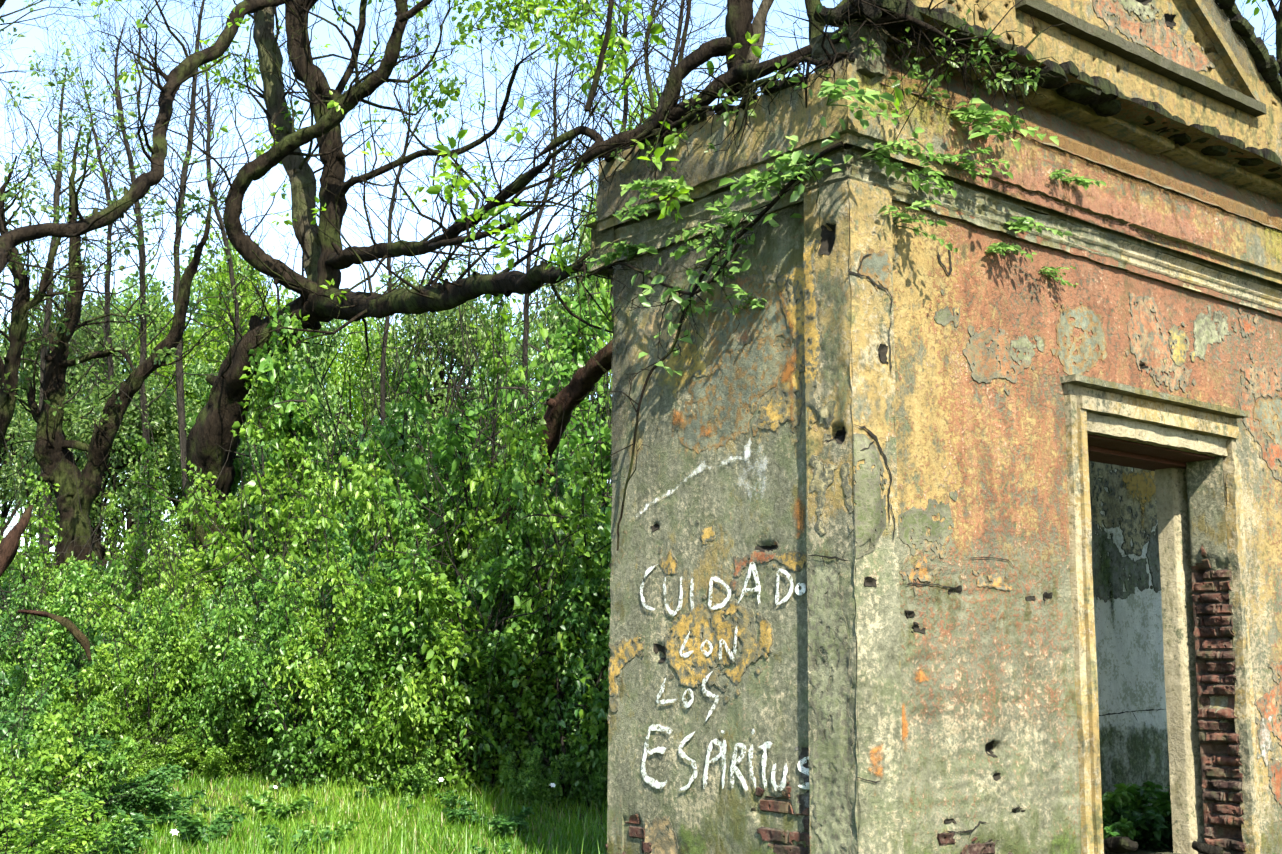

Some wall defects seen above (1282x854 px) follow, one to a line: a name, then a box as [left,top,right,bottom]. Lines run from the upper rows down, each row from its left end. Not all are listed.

flaking render [1092,0,1215,72]
crack [848,254,893,371]
flaking render [934,290,1108,395]
peeling [1125,291,1282,482]
flaking render [664,540,855,854]
flaking render [1191,545,1246,854]
peeling [1254,660,1282,808]
flaking render [937,832,1012,854]